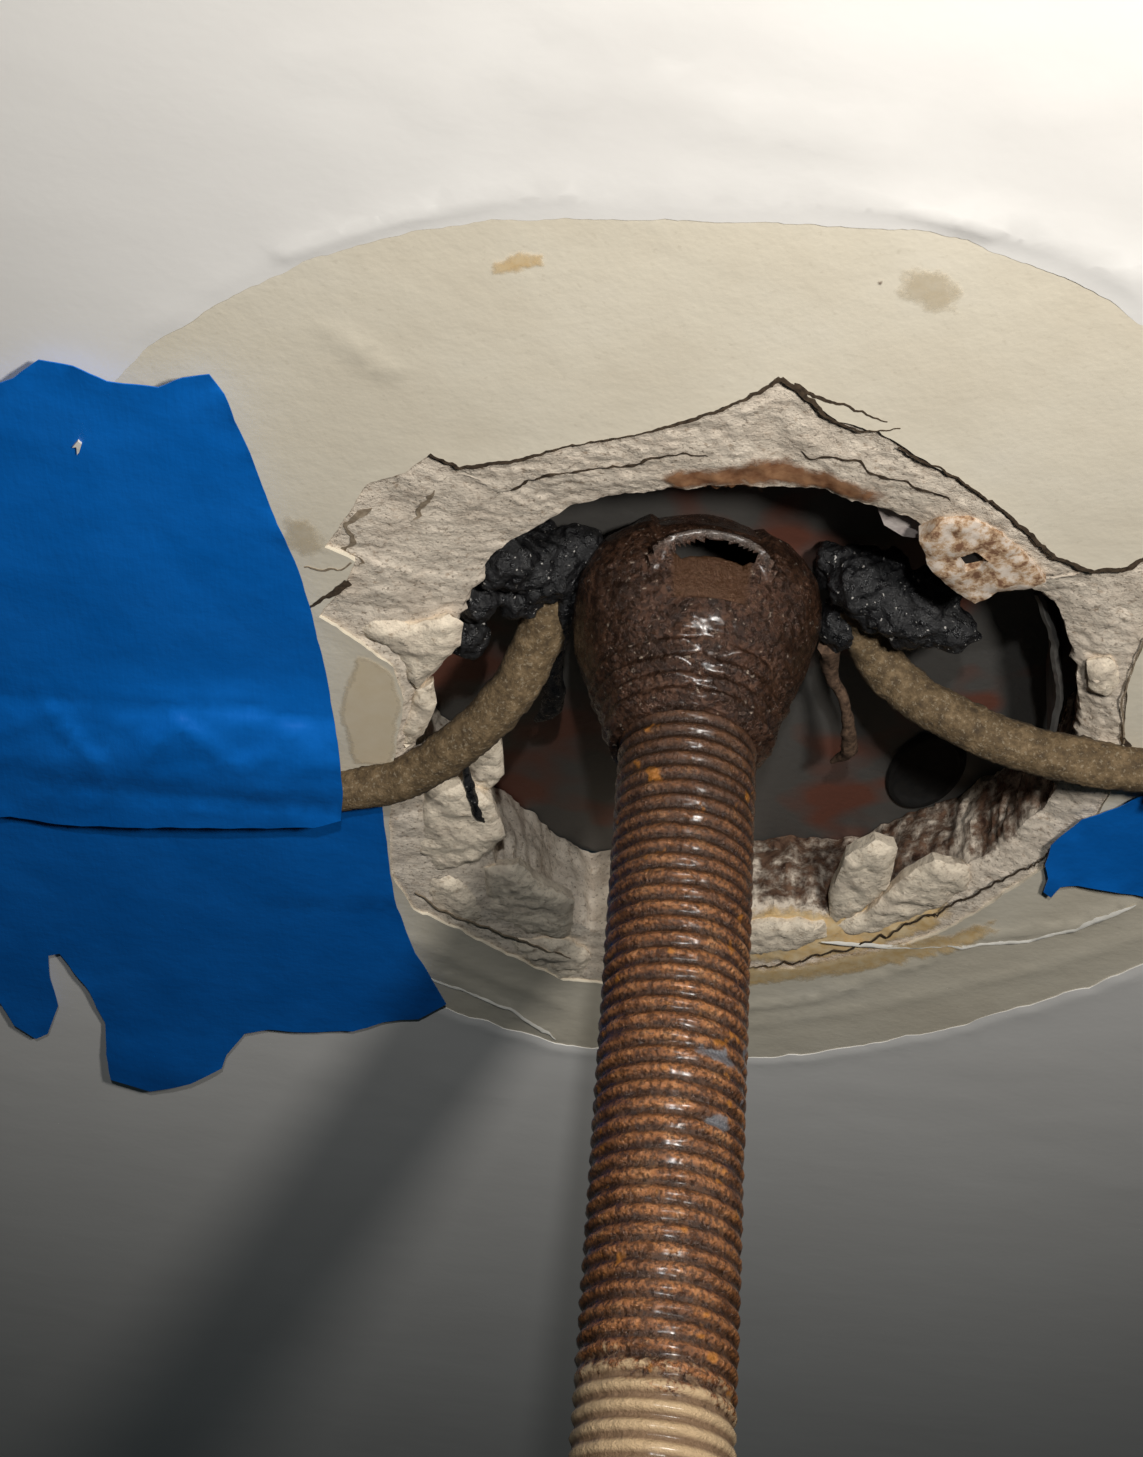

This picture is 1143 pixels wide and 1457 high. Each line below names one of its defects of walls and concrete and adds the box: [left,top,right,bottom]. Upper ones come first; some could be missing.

leakage [494,255,541,273]
crack [304,508,372,608]
peeling [115,218,1143,771]
corrosion [666,461,877,502]
crack [413,377,1143,574]
crack [1120,641,1143,747]
spalling [383,738,611,1048]
peeling [747,768,1143,1057]